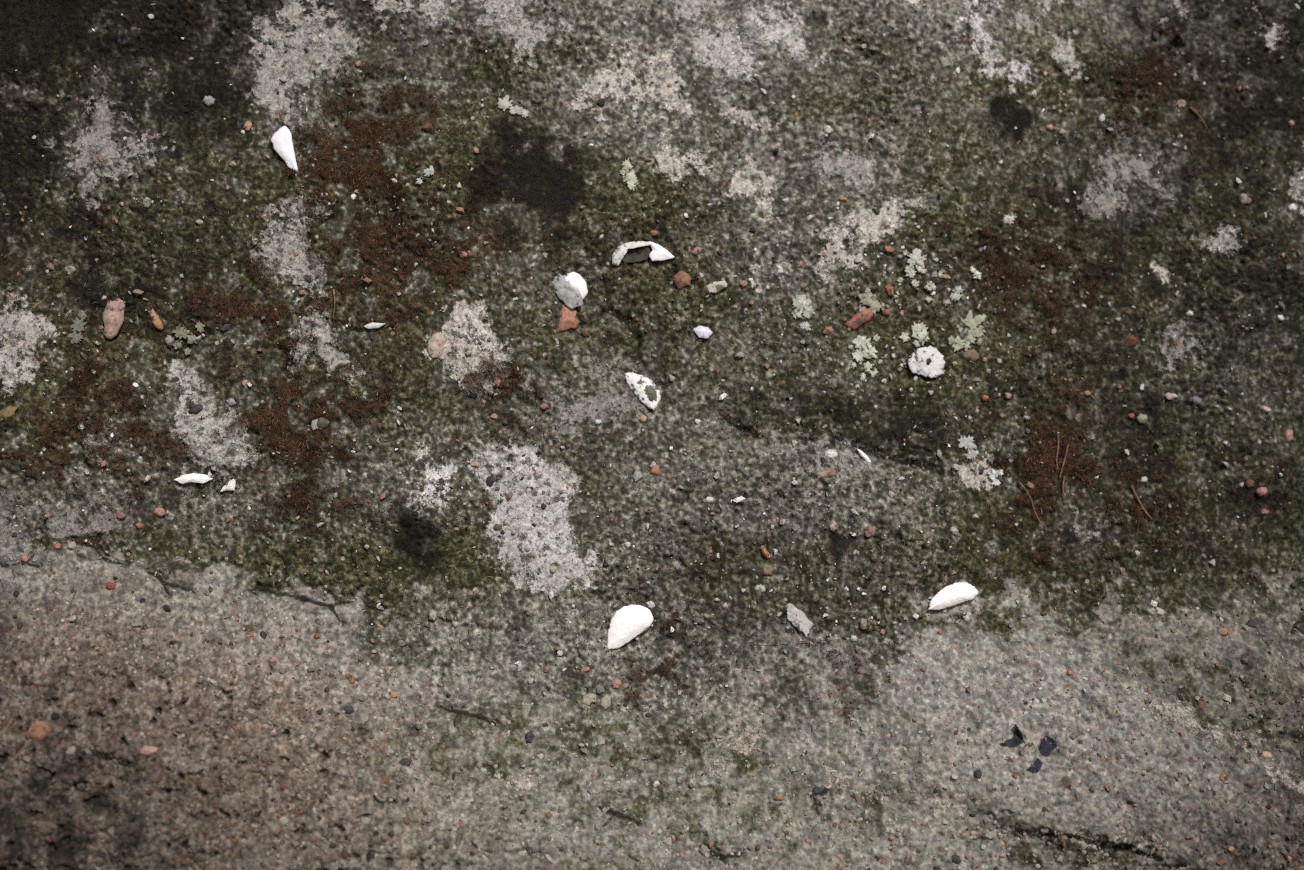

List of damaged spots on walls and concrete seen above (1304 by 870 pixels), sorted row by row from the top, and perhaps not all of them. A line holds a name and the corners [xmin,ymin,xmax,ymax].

water stain [459,113,616,250]
water stain [644,385,657,401]
water stain [384,499,440,573]